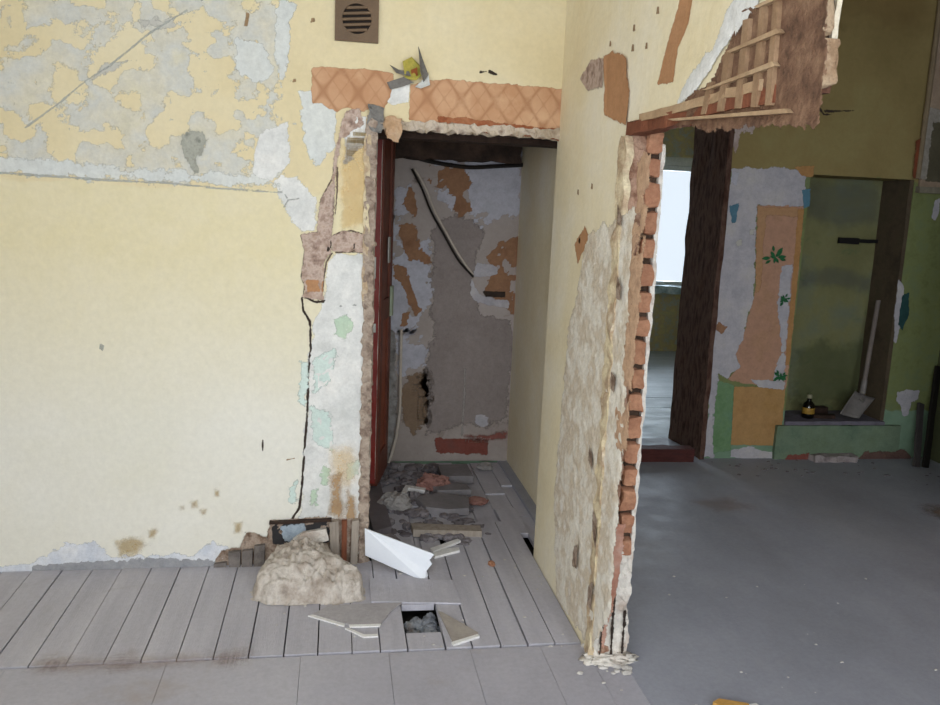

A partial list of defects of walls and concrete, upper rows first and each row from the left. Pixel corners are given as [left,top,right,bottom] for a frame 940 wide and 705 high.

flaking render [580,41,647,125]
flaking render [657,0,828,153]
crack [0,161,362,519]
peeling [0,0,560,573]
peeling [554,151,651,650]
peeling [704,166,814,458]
spalling [308,615,381,628]